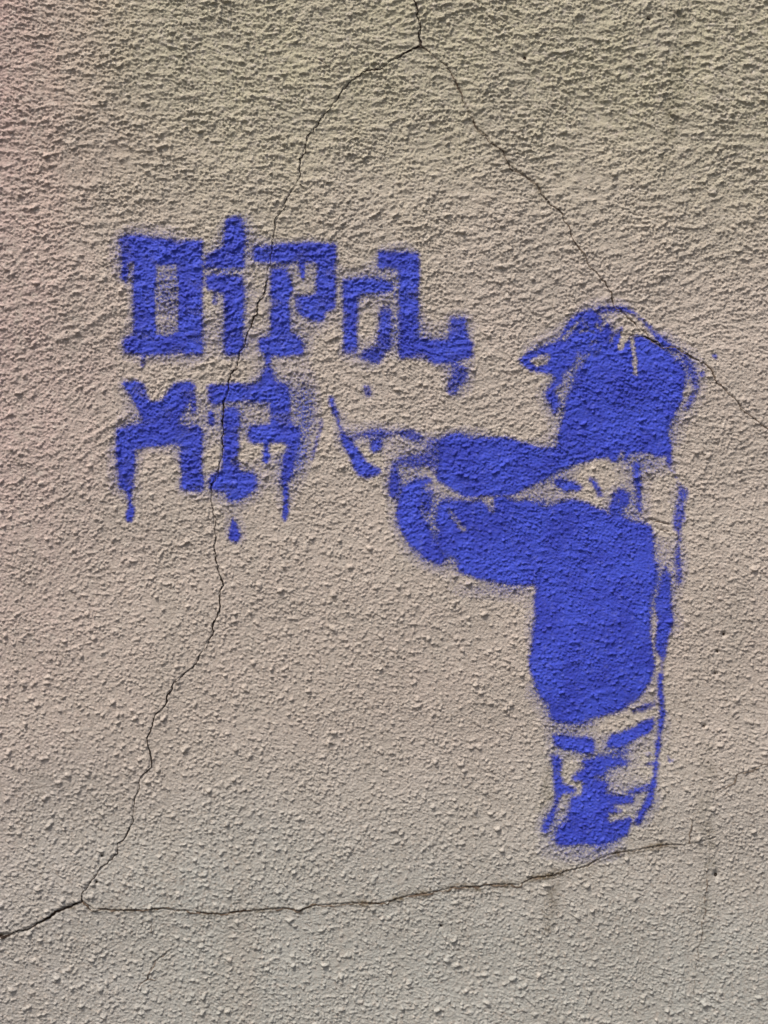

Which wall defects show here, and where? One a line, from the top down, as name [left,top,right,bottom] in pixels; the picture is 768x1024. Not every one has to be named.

crack [440,62,768,429]
crack [0,0,598,939]
crack [605,824,692,857]
crack [711,764,767,798]